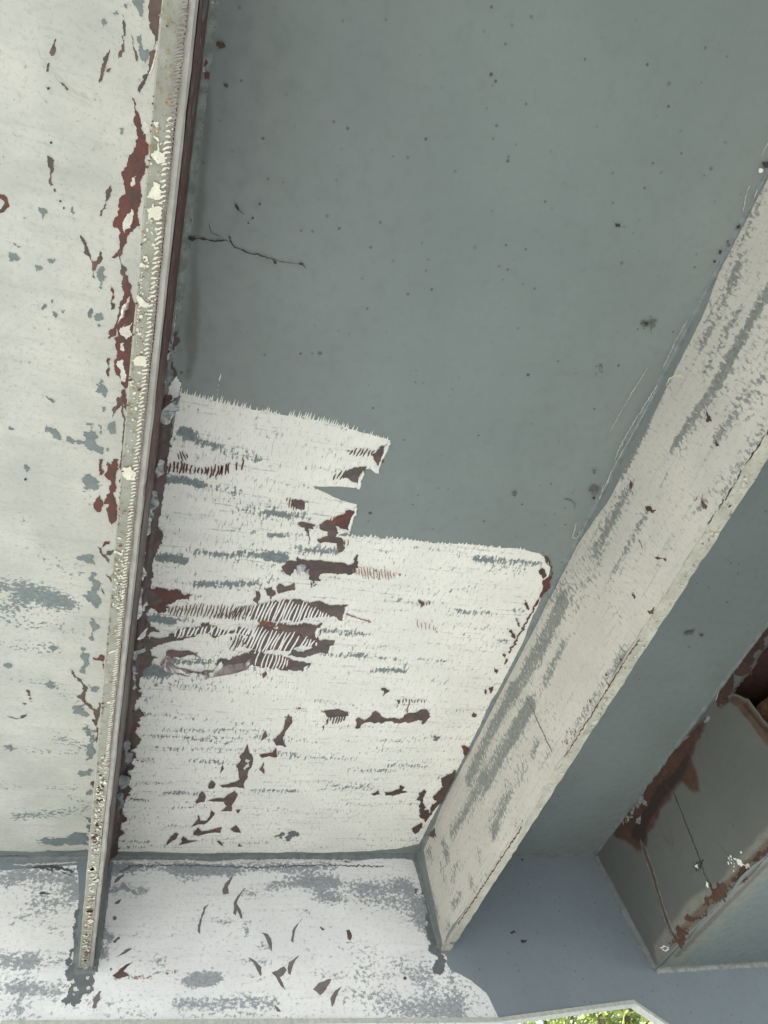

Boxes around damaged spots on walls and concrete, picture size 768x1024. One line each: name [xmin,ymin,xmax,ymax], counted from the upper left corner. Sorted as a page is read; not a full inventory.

crack [188,203,306,268]
rust [90,0,401,961]
peeling [0,0,502,1024]
peeling [118,180,768,945]
rust [707,430,768,525]
rust [562,640,639,757]
rust [458,815,525,924]
rust [612,628,768,968]
peeling [650,821,768,969]